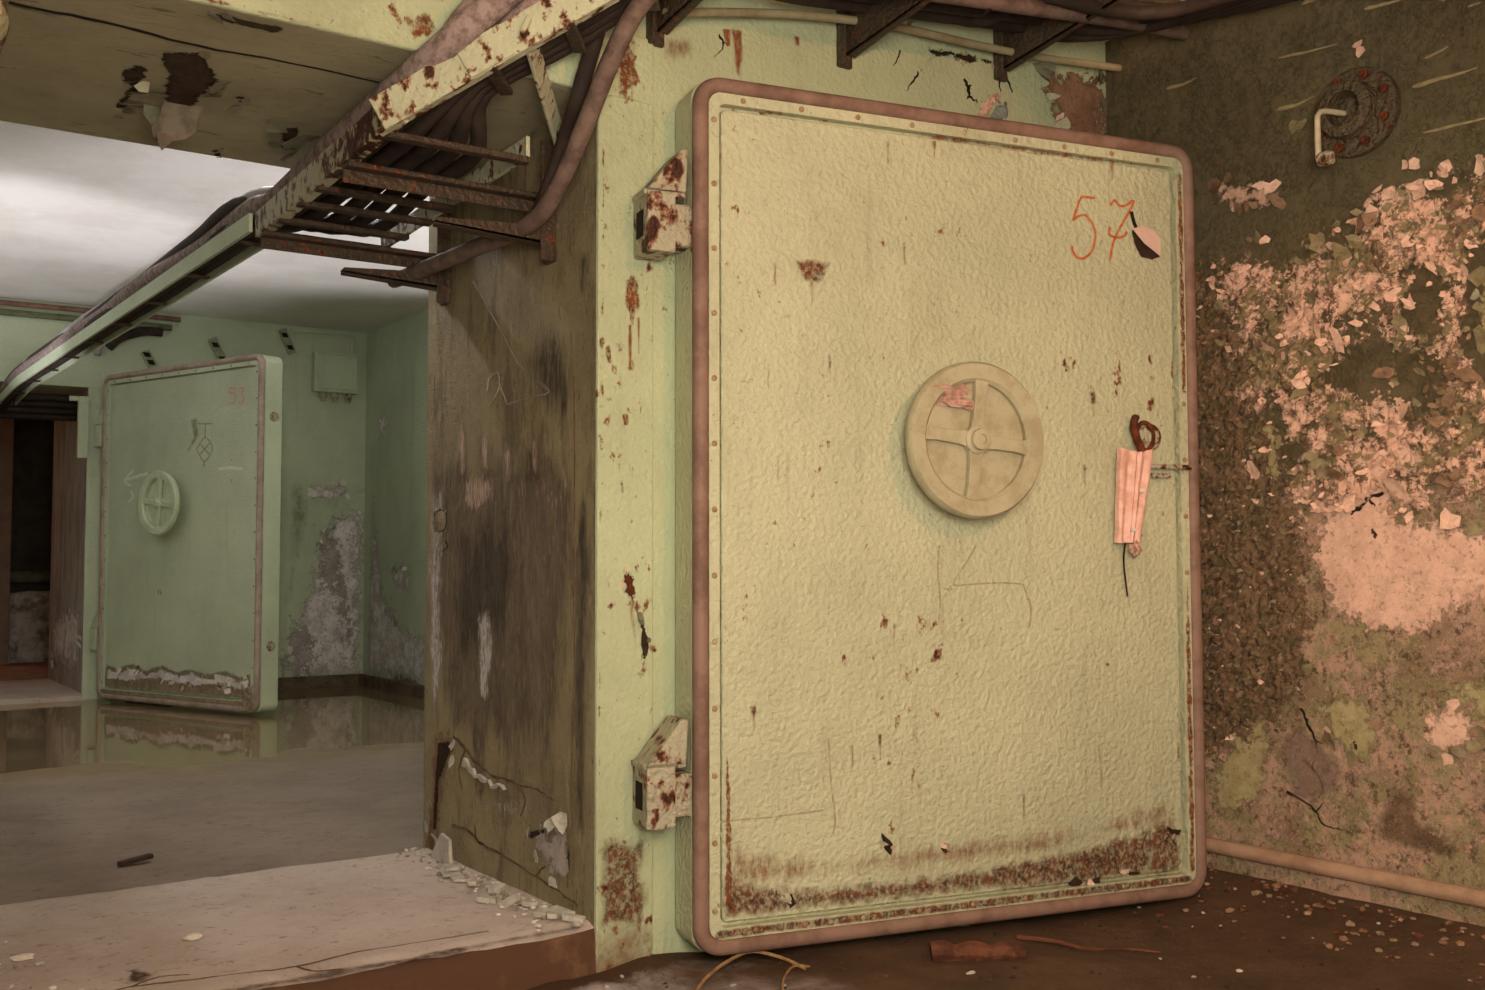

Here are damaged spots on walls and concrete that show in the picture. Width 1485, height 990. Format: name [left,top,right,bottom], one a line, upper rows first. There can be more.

peeling [113,51,251,150]
peeling [207,9,283,33]
rust [404,14,434,37]
rust [617,41,640,101]
rust [724,29,742,72]
peeling [1195,154,1485,819]
peeling [279,478,365,678]
damp [429,424,587,828]
rust [716,587,1195,938]
spalling [525,812,572,888]
rust [604,839,643,921]
damp [1381,795,1451,853]